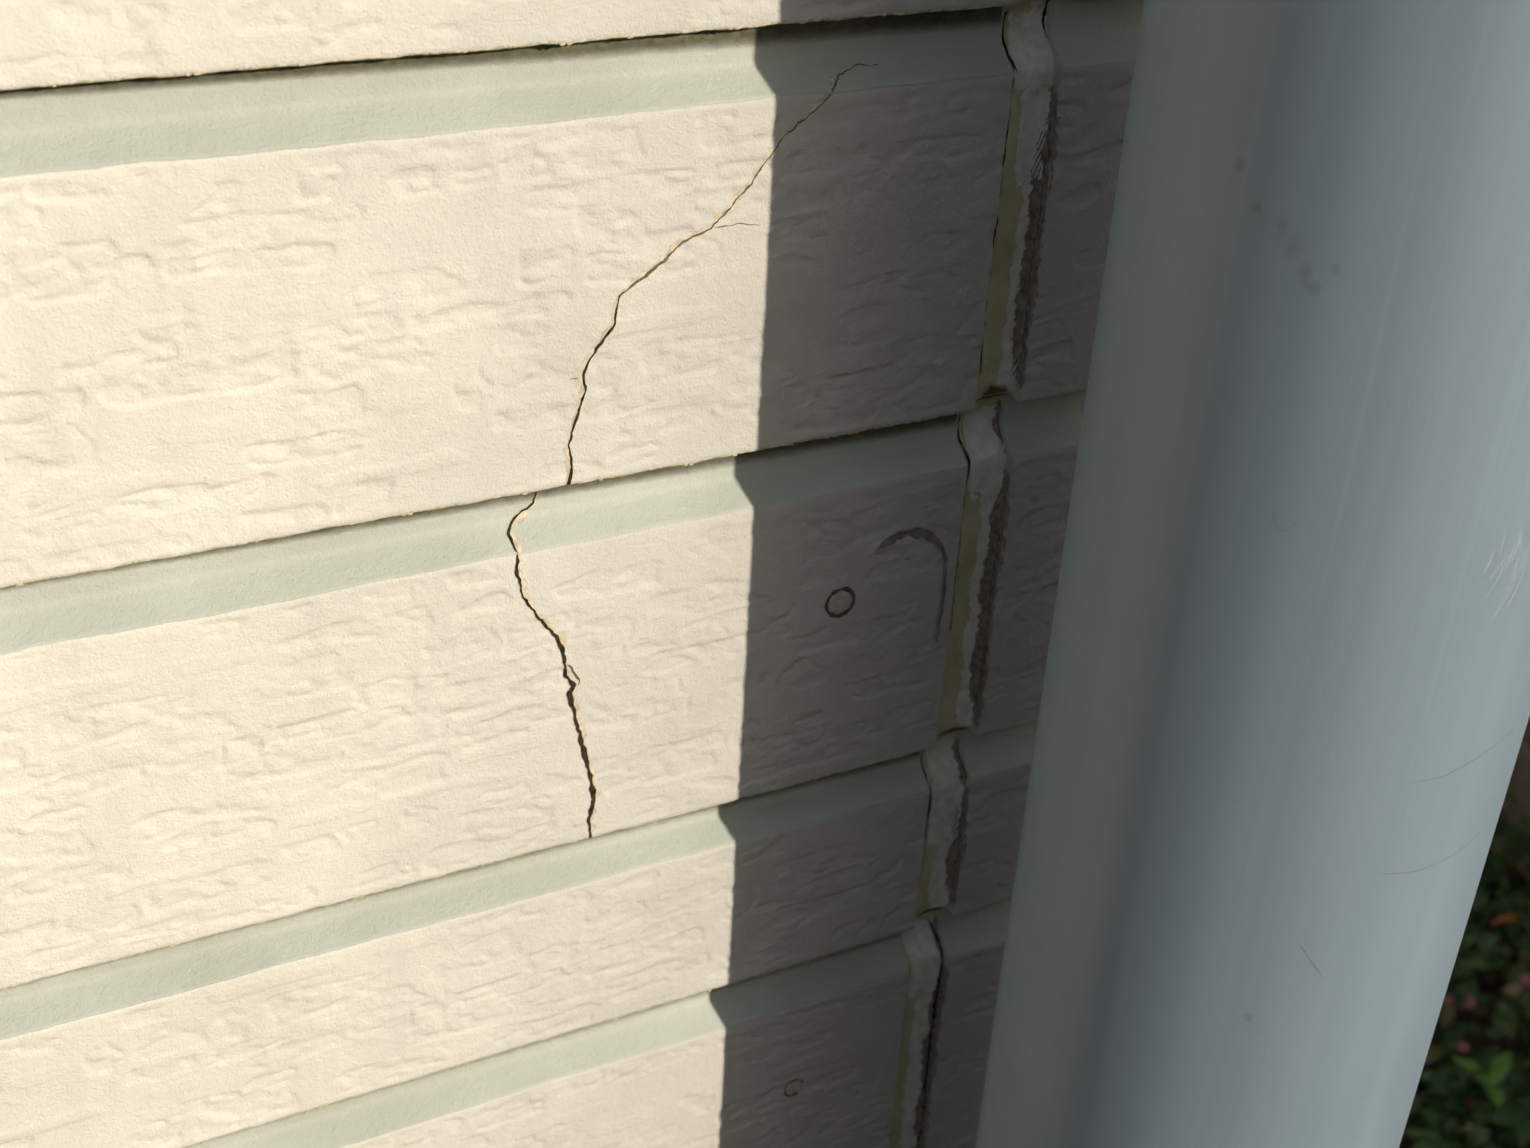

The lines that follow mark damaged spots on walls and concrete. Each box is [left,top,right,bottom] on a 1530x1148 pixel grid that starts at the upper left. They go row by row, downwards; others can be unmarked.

peeling [0,1,1054,1148]
crack [507,63,878,838]